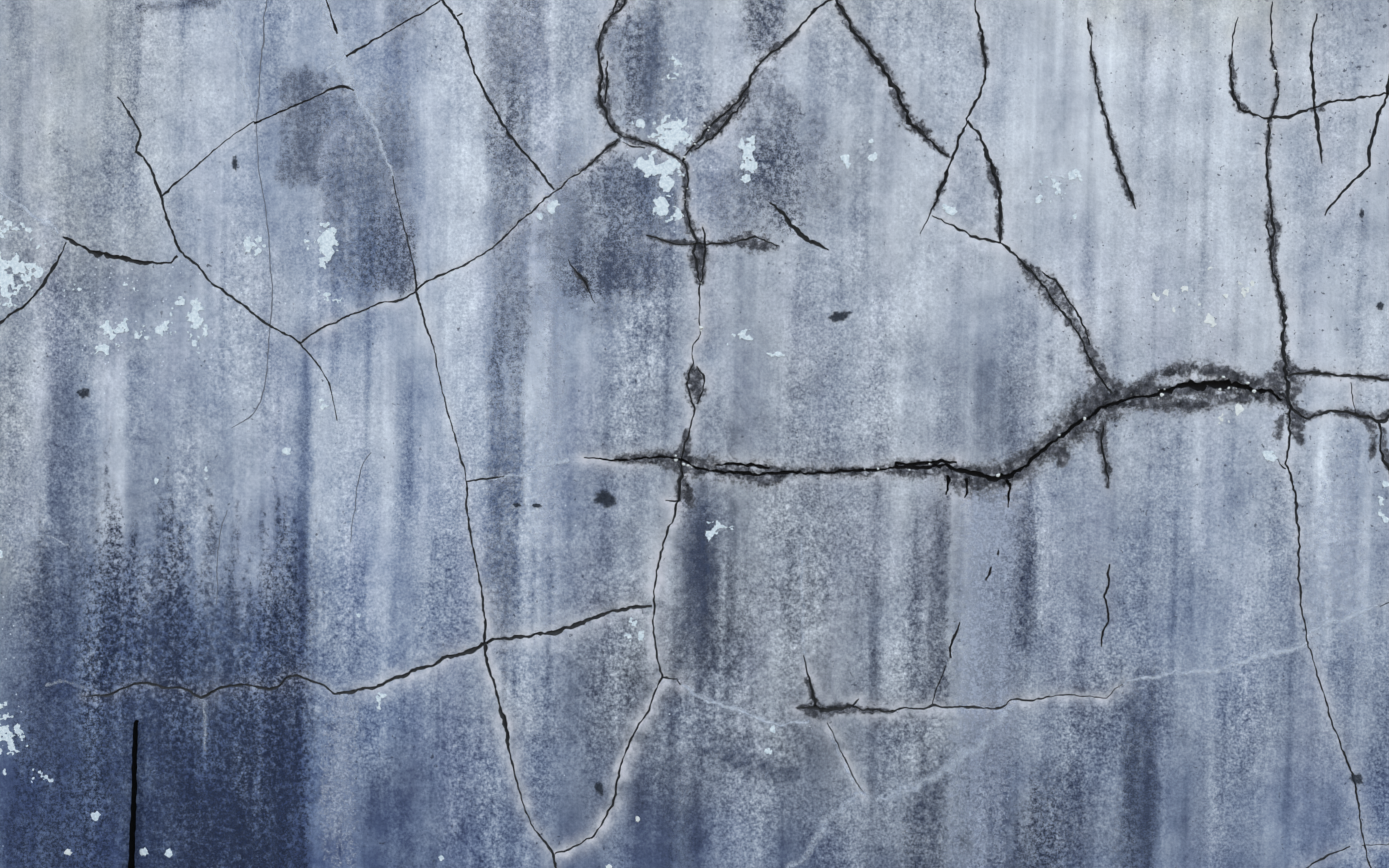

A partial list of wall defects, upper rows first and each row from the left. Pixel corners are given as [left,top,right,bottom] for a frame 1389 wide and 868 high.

peeling [0,215,46,308]
crack [0,236,178,325]
leakage [276,69,415,293]
crack [82,0,696,868]
leakage [487,0,657,348]
peeling [632,114,694,223]
peeling [738,135,757,183]
crack [584,0,1389,776]
peeling [0,702,28,775]
leakage [0,470,360,868]
leakage [906,485,1085,868]
crack [1354,783,1389,868]